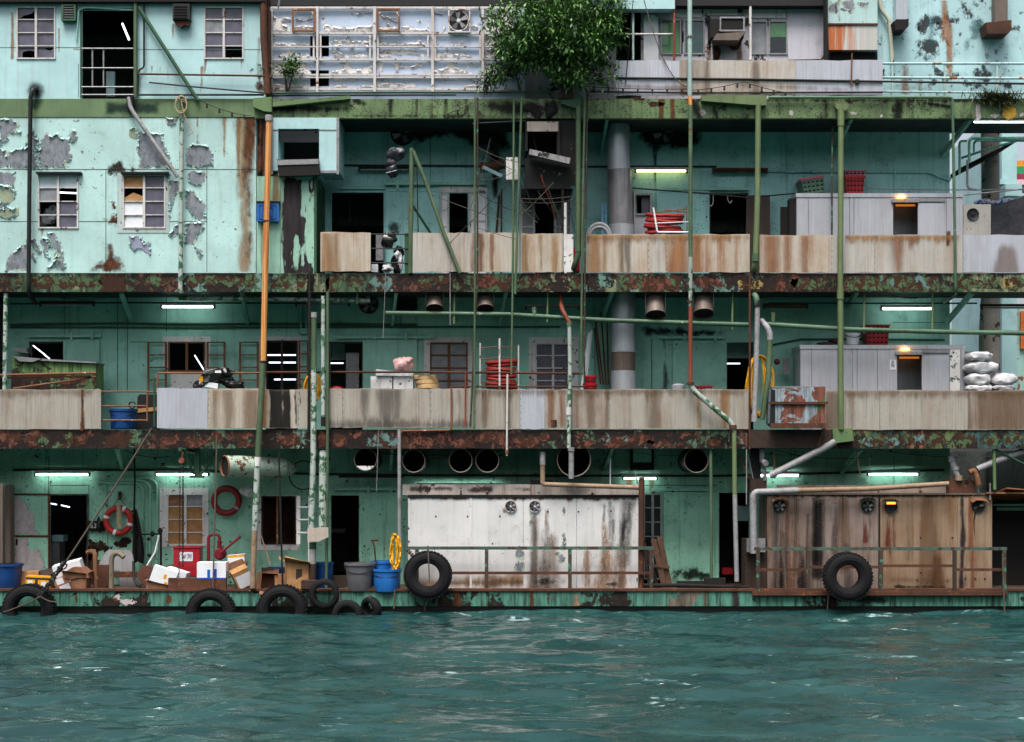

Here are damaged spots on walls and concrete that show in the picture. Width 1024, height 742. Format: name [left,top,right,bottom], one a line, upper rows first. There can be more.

peeling [273,9,514,88]
corrosion [943,0,952,73]
peeling [0,118,104,220]
peeling [129,117,214,260]
corrosion [223,117,263,270]
corrosion [93,244,122,271]
corrosion [669,235,708,272]
corrosion [768,236,789,272]
corrosion [895,236,915,264]
peeling [14,497,47,571]
leakage [529,515,549,588]